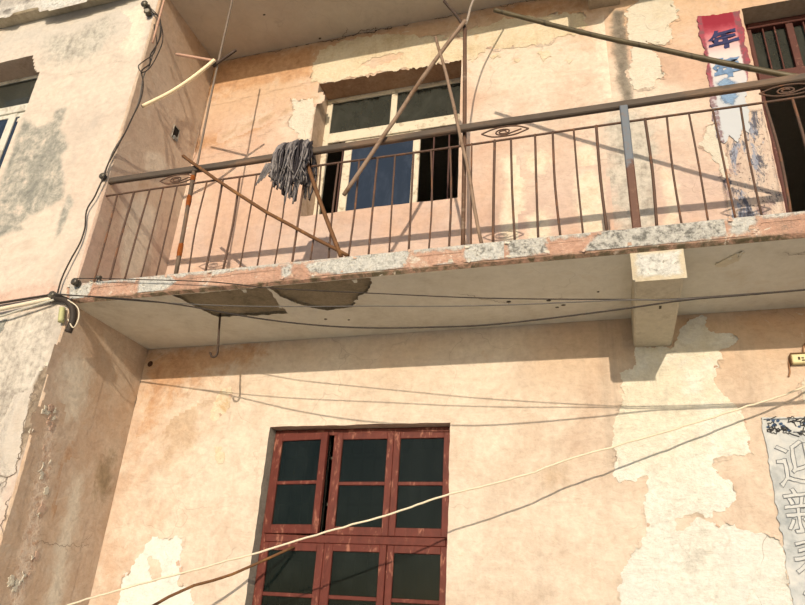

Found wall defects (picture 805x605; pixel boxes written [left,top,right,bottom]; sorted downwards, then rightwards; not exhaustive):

damp [0,0,35,18]
peeling [0,102,78,243]
peeling [286,98,317,141]
peeling [309,7,612,118]
damp [492,0,680,230]
peeling [624,0,682,92]
peeling [0,138,805,605]
crack [0,389,38,532]